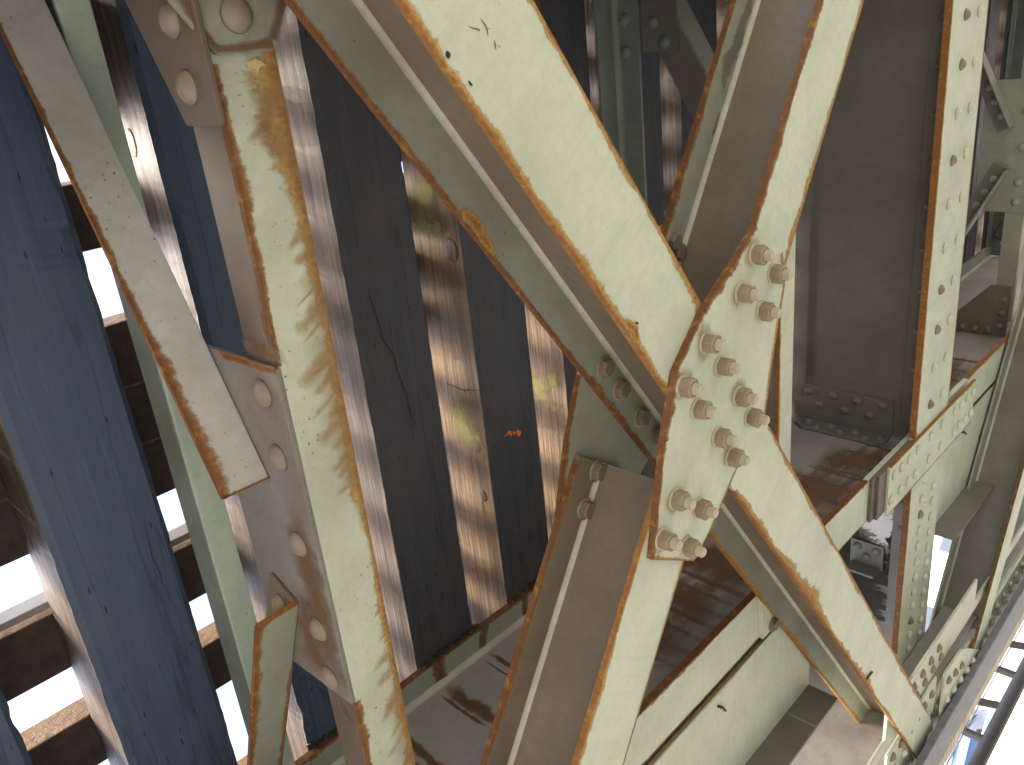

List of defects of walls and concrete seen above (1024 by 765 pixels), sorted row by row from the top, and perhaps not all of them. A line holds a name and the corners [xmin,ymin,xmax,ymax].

corrosion [0,23,270,500]
corrosion [206,0,917,765]
corrosion [764,0,1011,723]